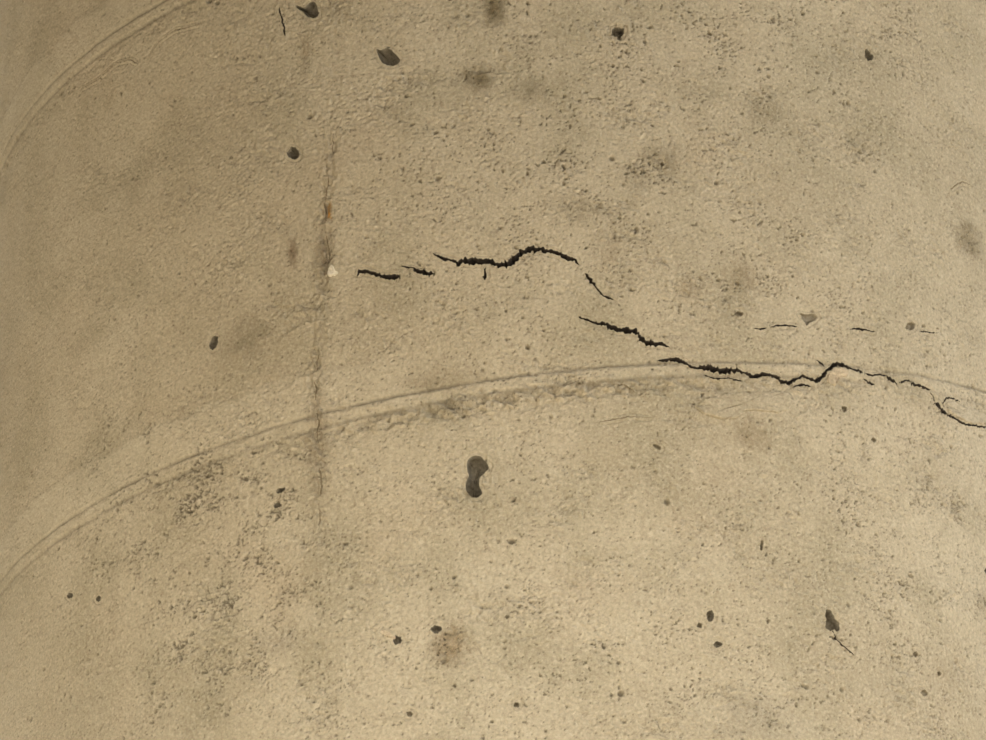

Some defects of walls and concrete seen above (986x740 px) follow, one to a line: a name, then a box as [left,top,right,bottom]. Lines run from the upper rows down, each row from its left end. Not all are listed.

crack [322,133,337,261]
crack [311,354,323,440]
crack [354,243,986,431]
crack [315,467,326,527]